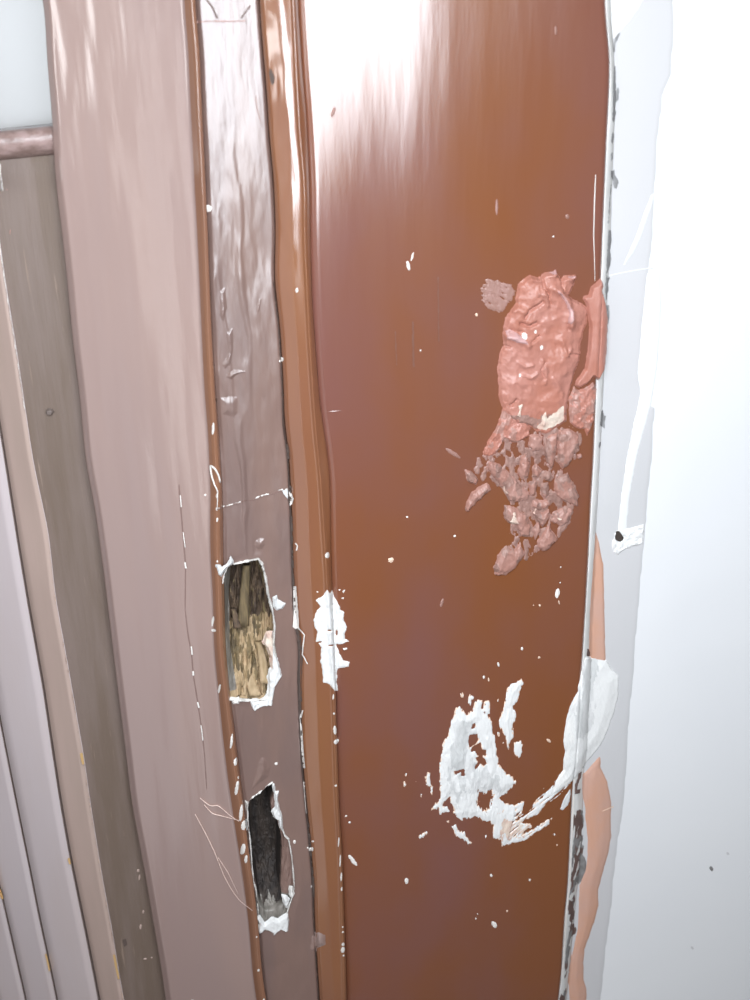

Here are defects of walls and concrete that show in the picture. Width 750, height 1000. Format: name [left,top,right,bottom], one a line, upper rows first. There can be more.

peeling [215,556,234,576]
peeling [272,595,286,611]
peeling [313,589,350,691]
peeling [587,532,606,660]
peeling [497,679,523,758]
peeling [447,820,472,844]
peeling [281,886,295,908]
peeling [559,757,614,1000]